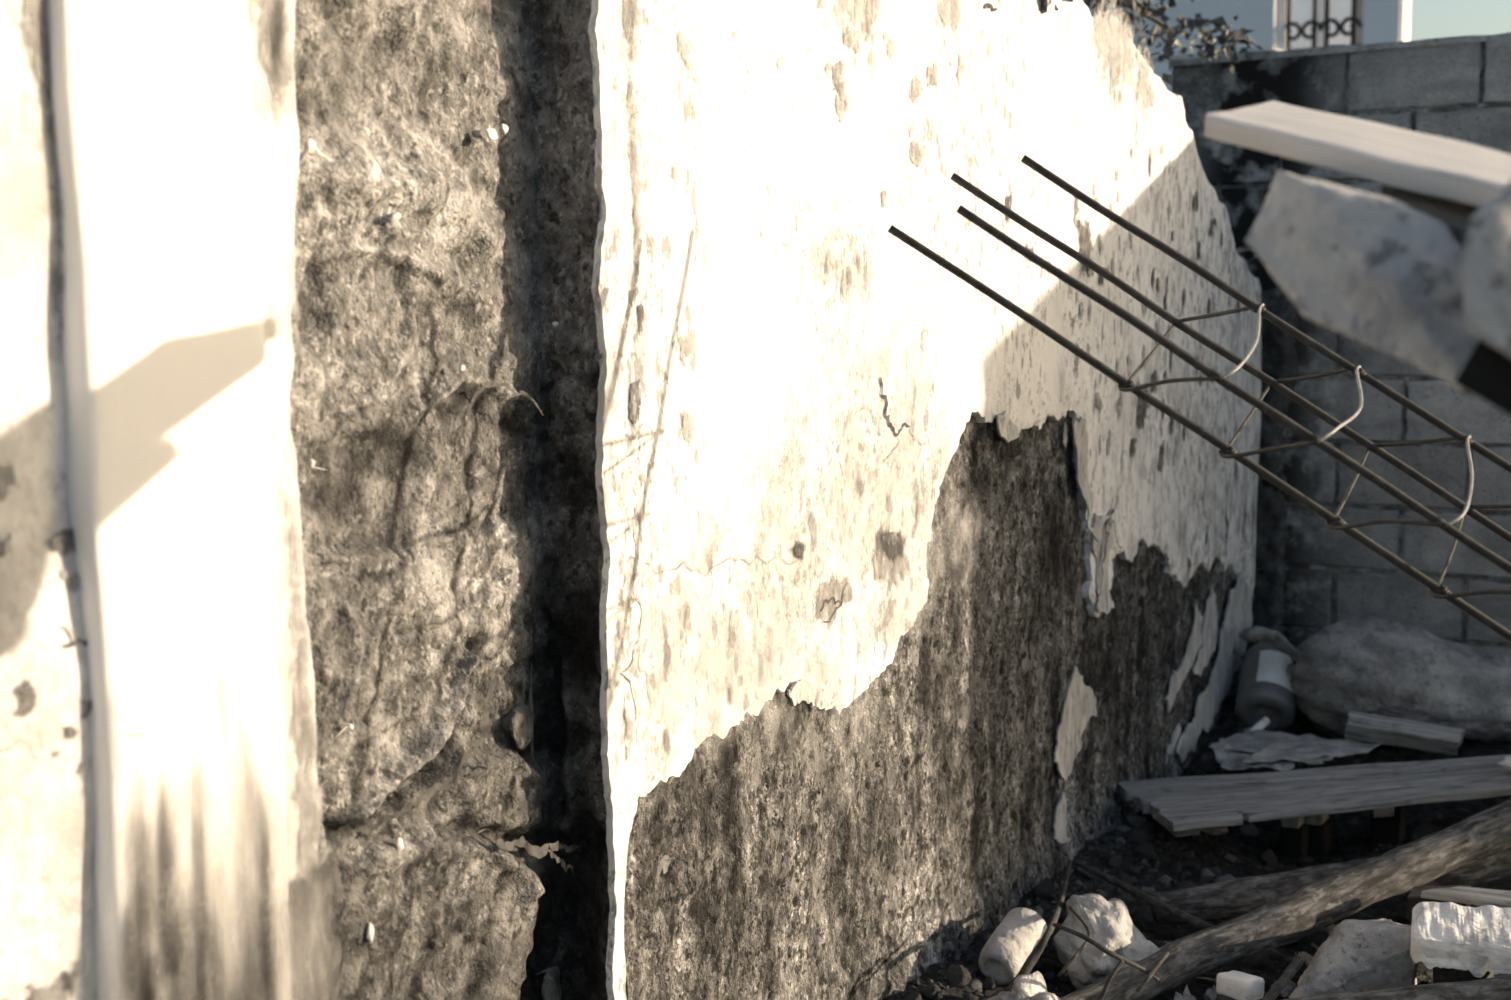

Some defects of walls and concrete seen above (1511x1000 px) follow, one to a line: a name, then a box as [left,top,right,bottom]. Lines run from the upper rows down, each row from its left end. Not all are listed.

peeling [614,0,644,336]
peeling [630,379,641,426]
peeling [909,124,926,169]
peeling [1070,149,1186,472]
peeling [1192,190,1223,260]
flaking render [624,392,1255,1000]